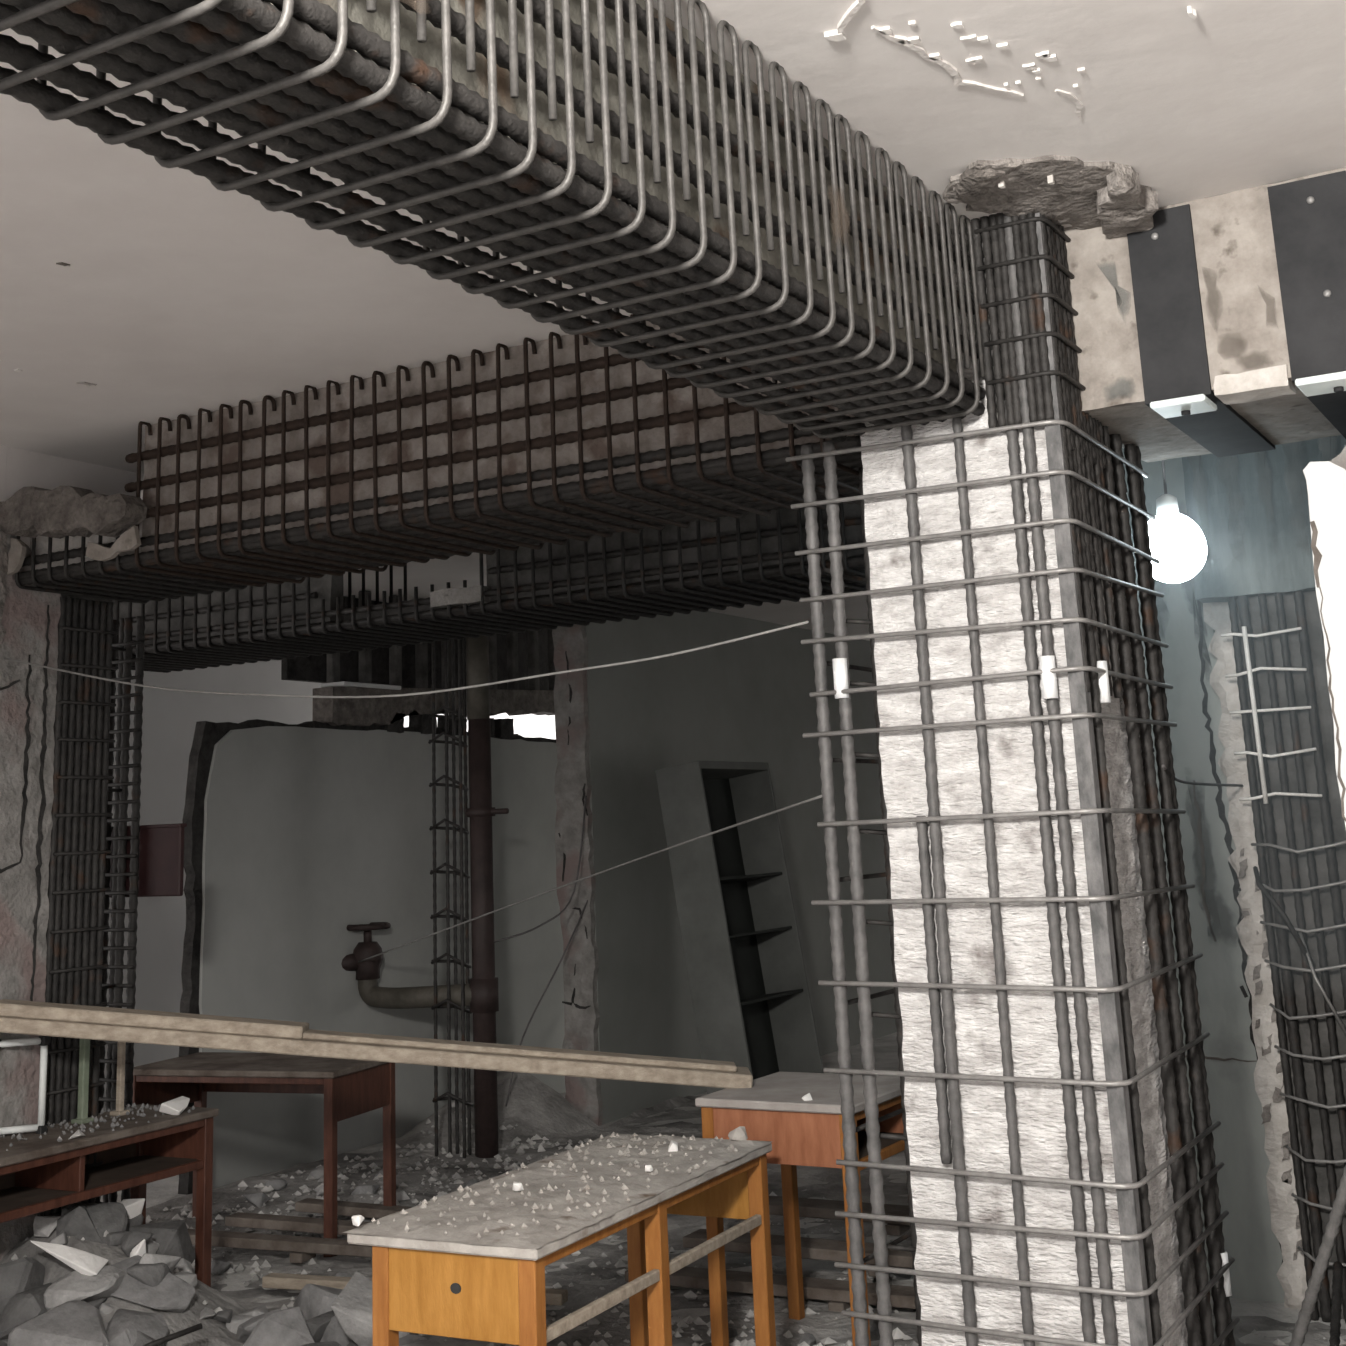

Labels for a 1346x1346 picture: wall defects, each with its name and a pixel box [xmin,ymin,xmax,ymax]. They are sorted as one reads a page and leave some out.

peeling [824,0,866,42]
peeling [871,20,1058,97]
peeling [1055,67,1086,119]
spalling [942,155,1158,239]
spalling [1310,521,1346,822]
spalling [0,486,148,1002]
spalling [552,624,600,1051]
spalling [0,1032,41,1127]
spalling [565,1076,603,1126]
spalling [0,1213,37,1261]